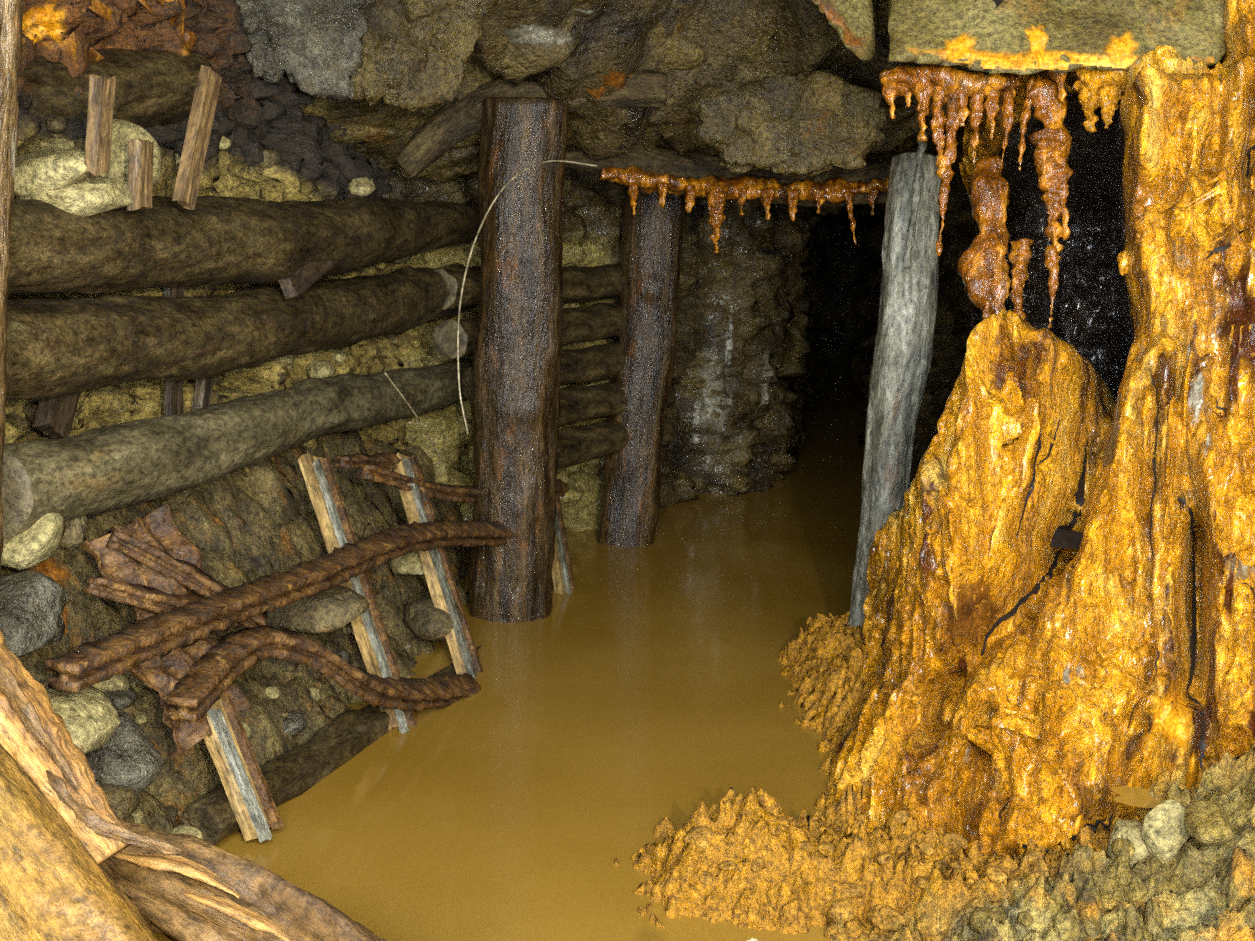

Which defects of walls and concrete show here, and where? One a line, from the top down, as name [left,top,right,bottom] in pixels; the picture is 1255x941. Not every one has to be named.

rust [599,166,889,254]
rust [879,26,1139,328]